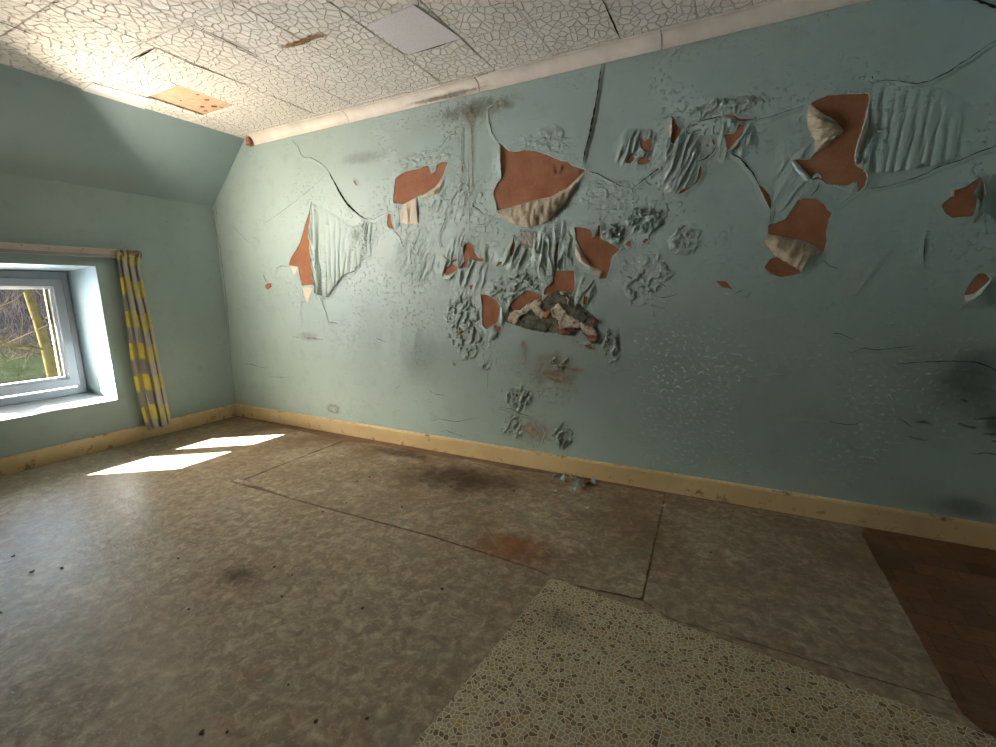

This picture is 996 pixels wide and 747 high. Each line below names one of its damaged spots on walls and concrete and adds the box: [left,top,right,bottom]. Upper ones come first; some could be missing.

crack [602,0,620,37]
crack [131,48,246,85]
damp [423,88,476,102]
crack [582,63,663,193]
peeling [385,156,467,232]
peeling [486,135,593,268]
peeling [755,82,881,284]
peeling [933,172,991,225]
peeling [286,198,362,302]
peeling [443,239,484,280]
spalling [468,220,651,352]
crack [900,361,996,371]